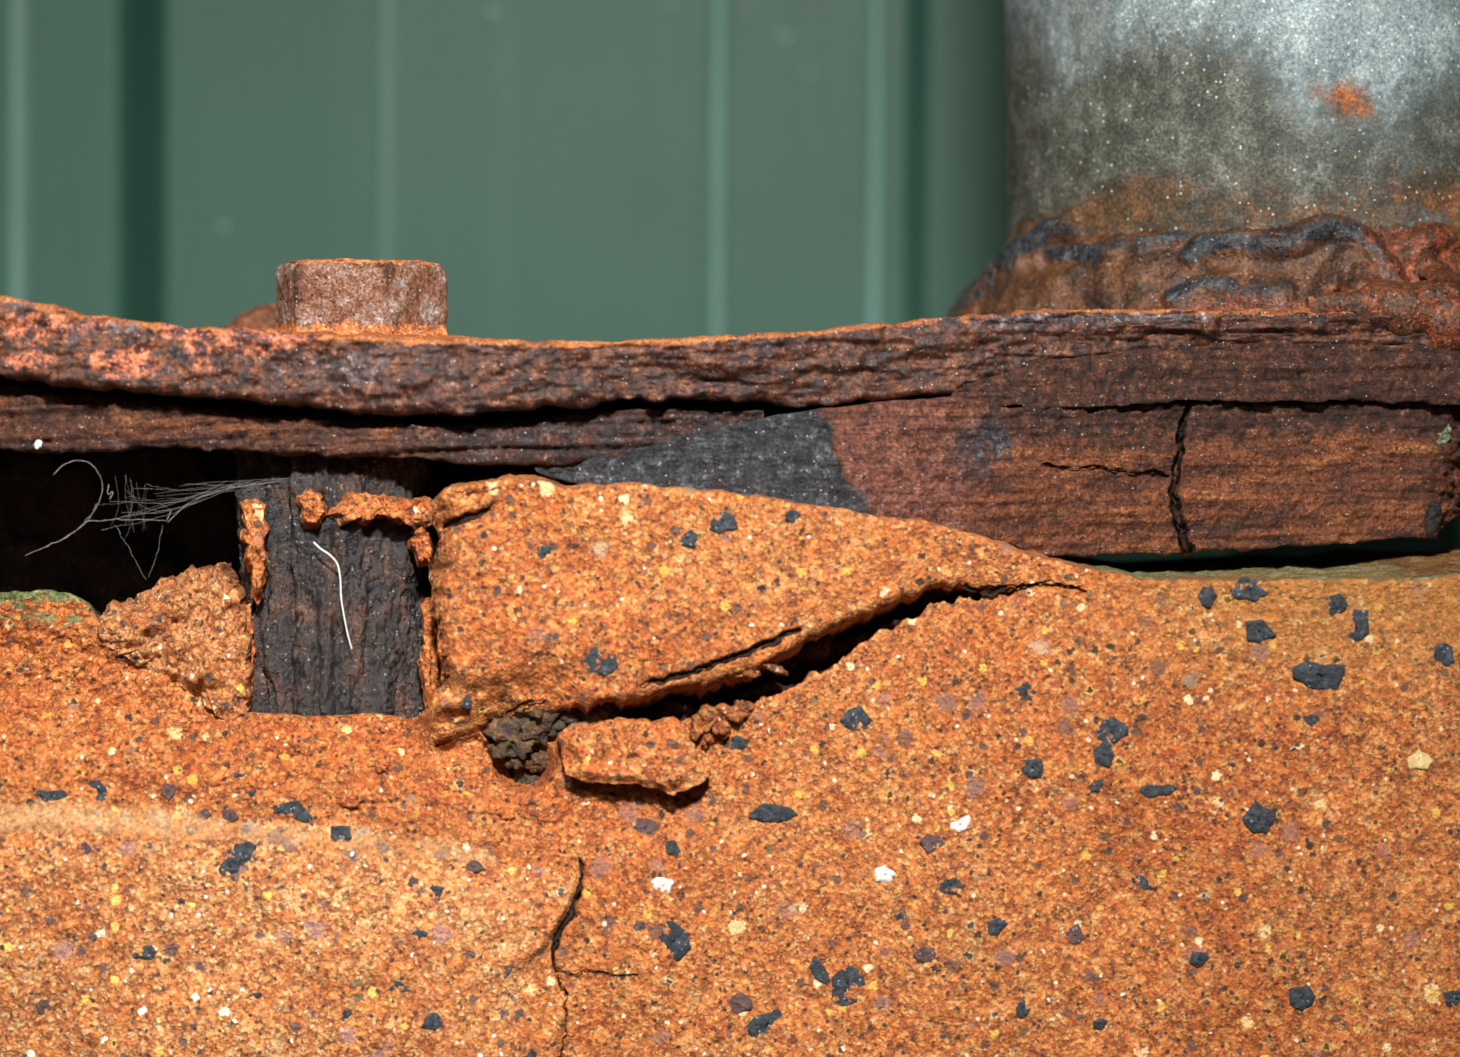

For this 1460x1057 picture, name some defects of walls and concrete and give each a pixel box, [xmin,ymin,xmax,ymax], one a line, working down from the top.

rust [1330,86,1371,116]
crack [1041,407,1196,553]
spalling [0,562,576,822]
crack [489,579,1087,744]
crack [551,858,636,1057]